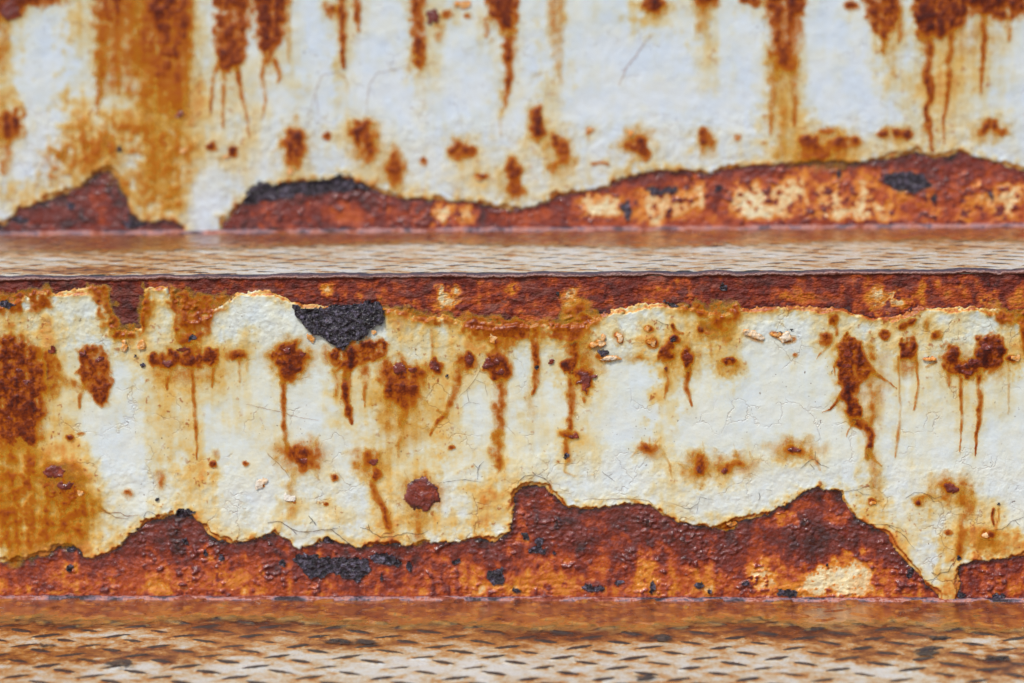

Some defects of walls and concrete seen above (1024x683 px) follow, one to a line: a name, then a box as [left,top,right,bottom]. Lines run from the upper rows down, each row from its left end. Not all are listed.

rust [209,0,291,138]
rust [484,0,520,111]
rust [739,0,861,162]
rust [844,0,1024,154]
peeling [0,170,184,232]
peeling [222,151,1024,230]
peeling [0,274,1024,351]
rust [0,285,248,566]
rust [267,301,601,482]
rust [817,309,1024,506]
peeling [0,485,939,599]
peeling [957,555,1024,599]